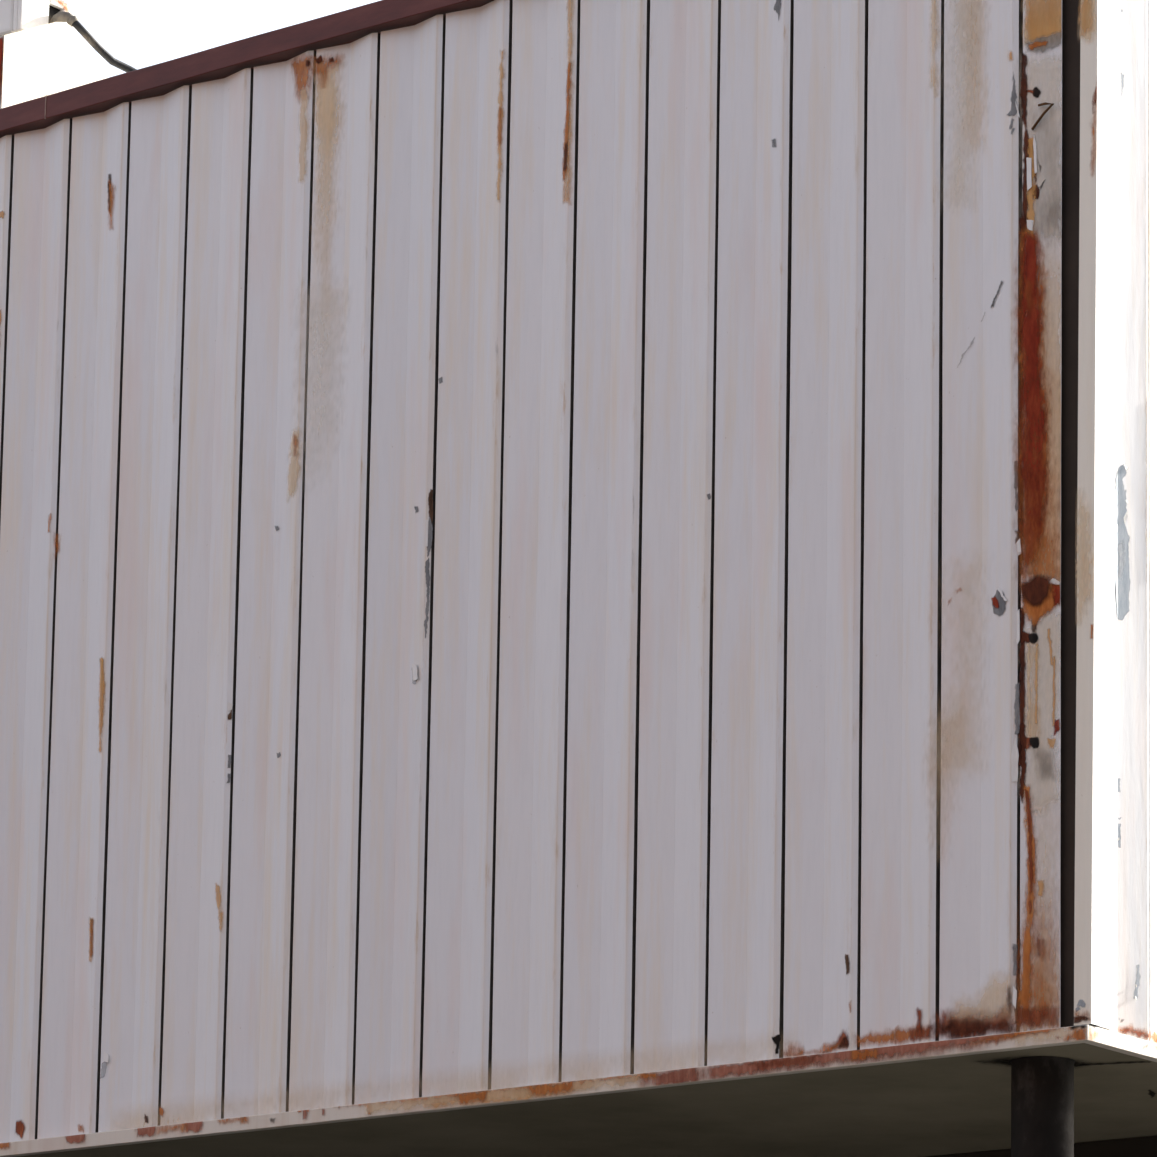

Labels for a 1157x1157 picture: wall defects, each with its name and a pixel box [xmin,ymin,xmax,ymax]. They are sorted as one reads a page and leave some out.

rust [292,55,338,197]
rust [562,1,571,200]
rust [1017,230,1061,645]
peeling [1114,462,1130,620]
rust [1047,719,1060,747]
rust [338,786,1096,1114]
rust [1120,1027,1157,1047]